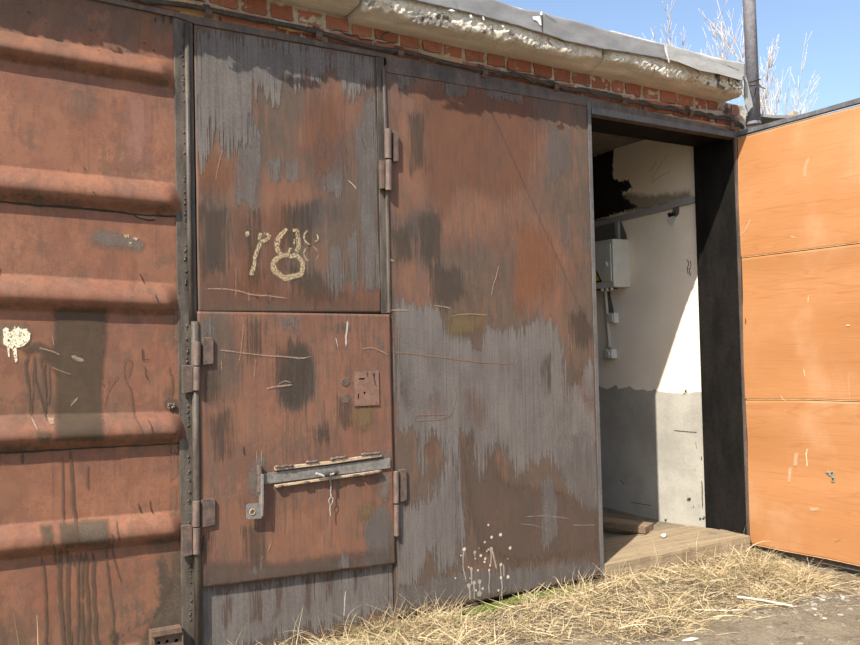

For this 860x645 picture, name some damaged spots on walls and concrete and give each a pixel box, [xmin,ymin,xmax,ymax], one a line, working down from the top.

spalling [412,9,456,28]
peeling [195,23,380,299]
peeling [667,207,679,225]
leakage [41,451,121,645]
peeling [201,296,599,645]
corrosion [462,434,598,564]